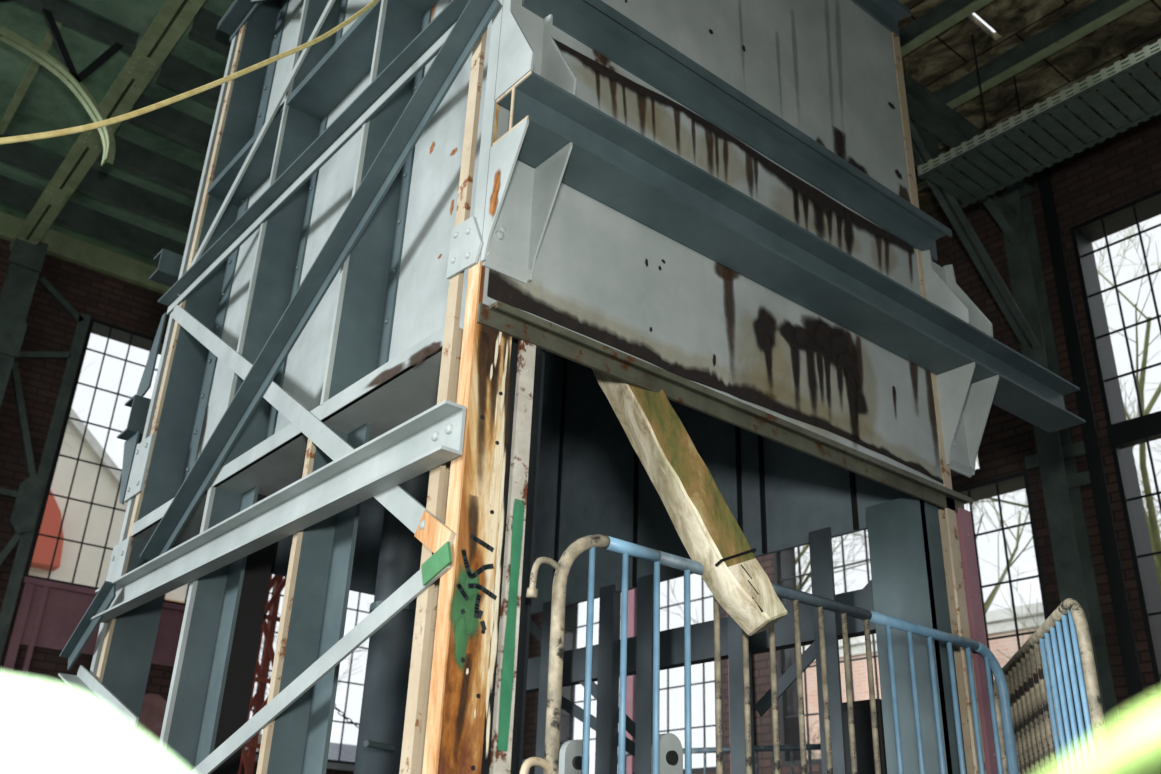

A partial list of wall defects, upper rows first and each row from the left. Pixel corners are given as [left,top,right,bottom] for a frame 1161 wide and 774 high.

corrosion [553,38,914,278]
corrosion [487,262,944,484]